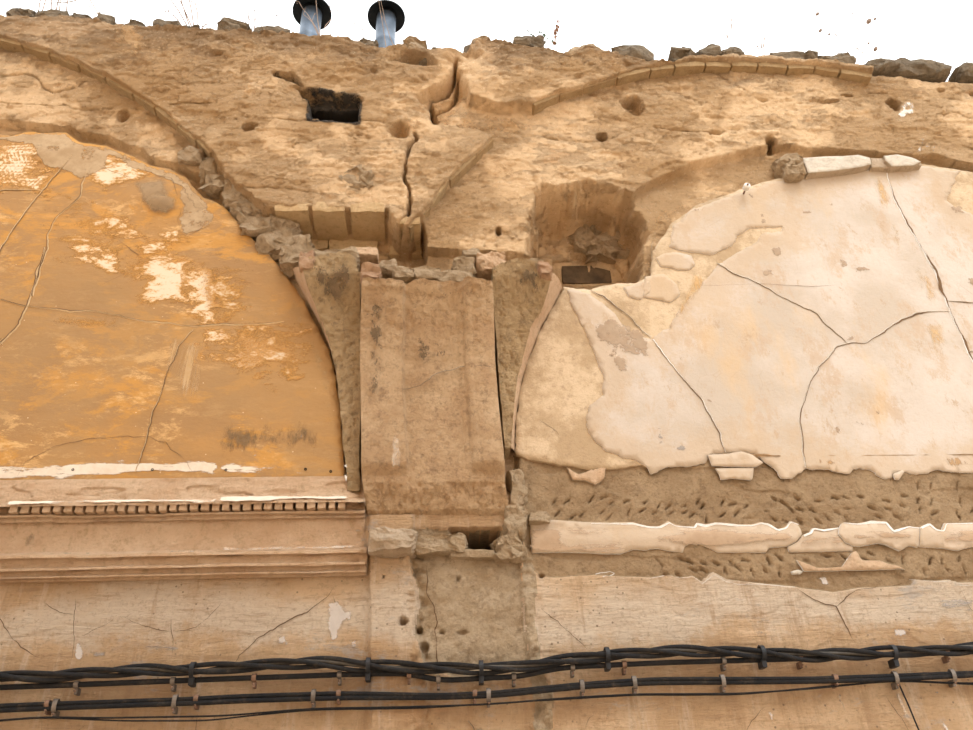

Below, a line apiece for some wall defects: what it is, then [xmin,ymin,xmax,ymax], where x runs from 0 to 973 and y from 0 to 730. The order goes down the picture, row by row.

peeling [0,133,213,234]
crack [0,159,284,477]
crack [717,173,973,467]
crack [591,290,726,452]
flaking render [567,468,606,485]
flaking render [708,451,763,480]
flaking render [530,520,973,580]